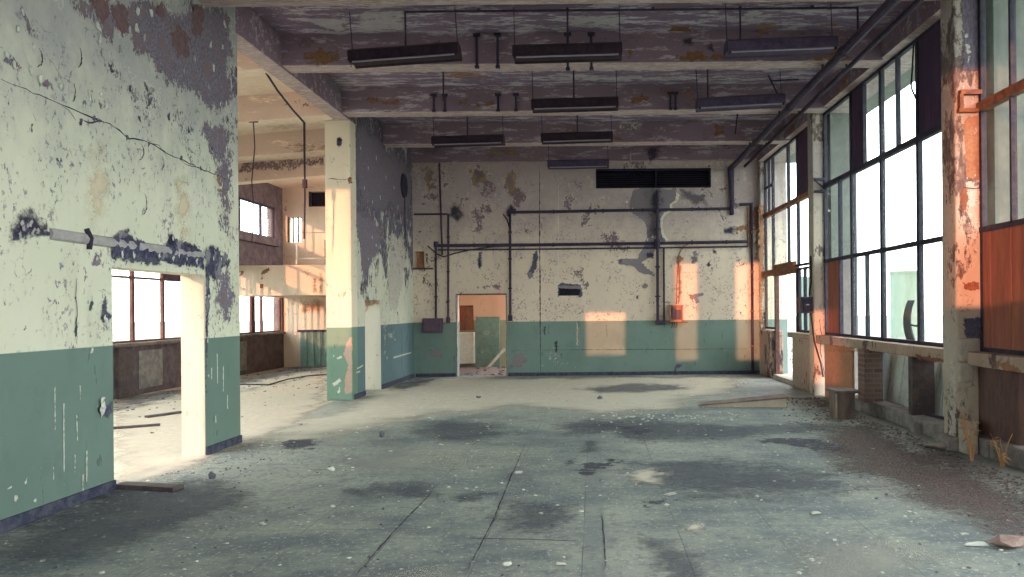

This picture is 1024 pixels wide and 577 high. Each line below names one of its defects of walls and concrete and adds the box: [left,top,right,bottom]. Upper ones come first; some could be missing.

peeling [304,48,340,68]
peeling [311,10,404,34]
peeling [554,15,631,32]
peeling [668,26,724,62]
crack [6,81,232,182]
corrosion [962,115,979,180]
spalling [11,209,50,240]
peeling [62,0,238,393]
peeling [348,122,439,358]
peeling [600,188,680,299]
corrosion [962,281,980,291]
peeling [332,337,363,395]